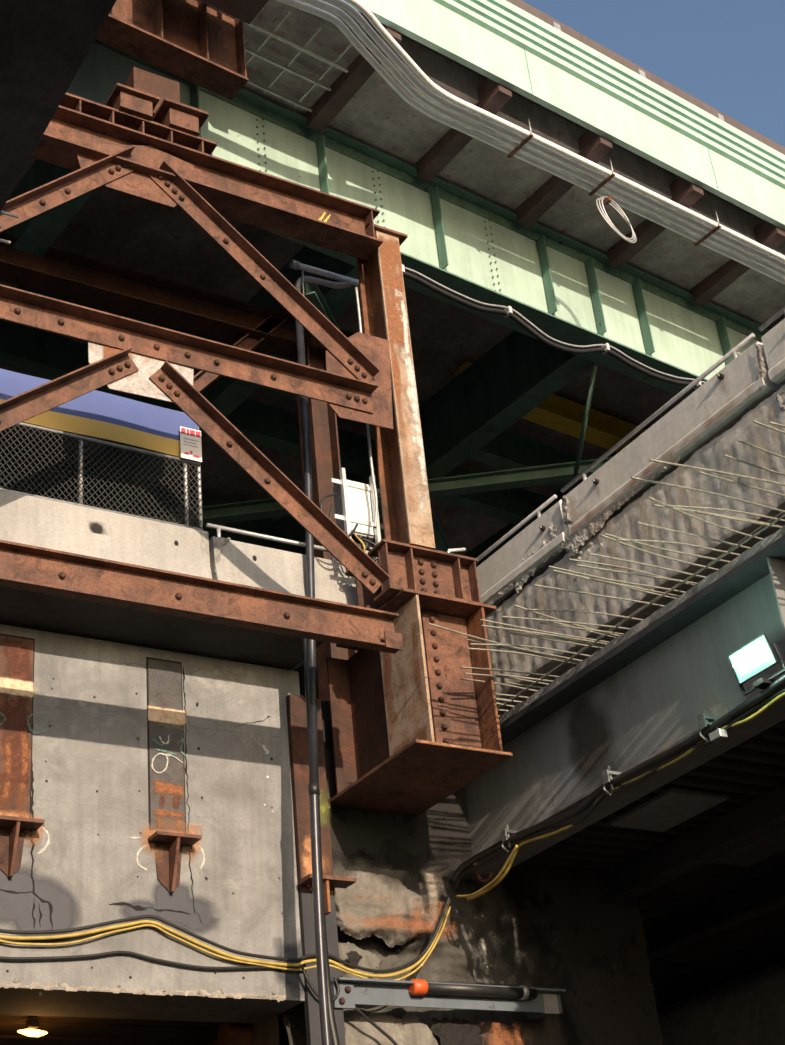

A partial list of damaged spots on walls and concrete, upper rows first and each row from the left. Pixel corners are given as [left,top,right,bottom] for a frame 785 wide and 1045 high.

corrosion [379,237,411,434]
spalling [428,454,785,717]
corrosion [5,641,30,682]
corrosion [0,694,42,840]
crack [0,763,53,930]
crack [109,667,203,924]
corrosion [145,781,198,853]
corrosion [303,838,324,890]
corrosion [394,727,461,754]
leakage [0,870,76,943]
leakage [123,884,217,932]
spalling [431,1014,484,1045]